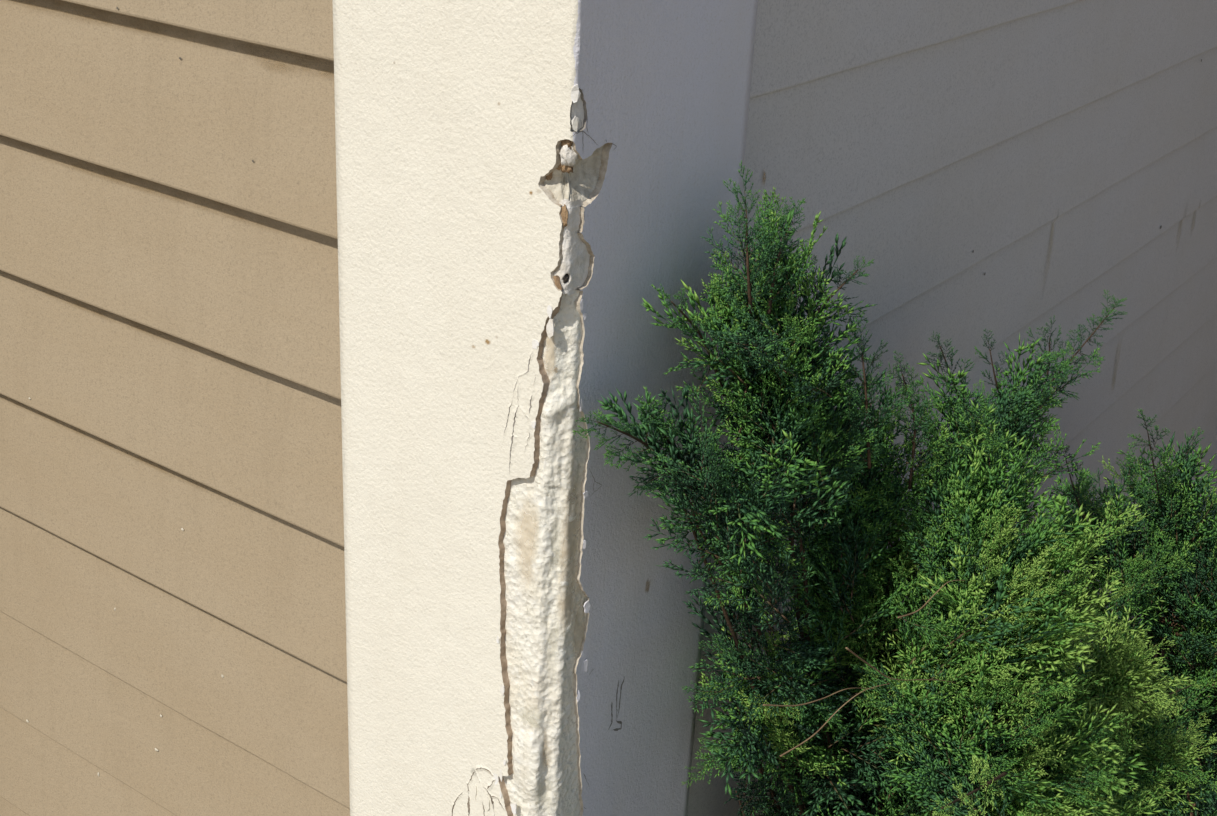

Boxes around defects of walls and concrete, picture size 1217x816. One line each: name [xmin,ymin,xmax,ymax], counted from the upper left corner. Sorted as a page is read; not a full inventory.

crack [500,350,537,475]
spalling [493,84,613,816]
crack [450,764,506,816]